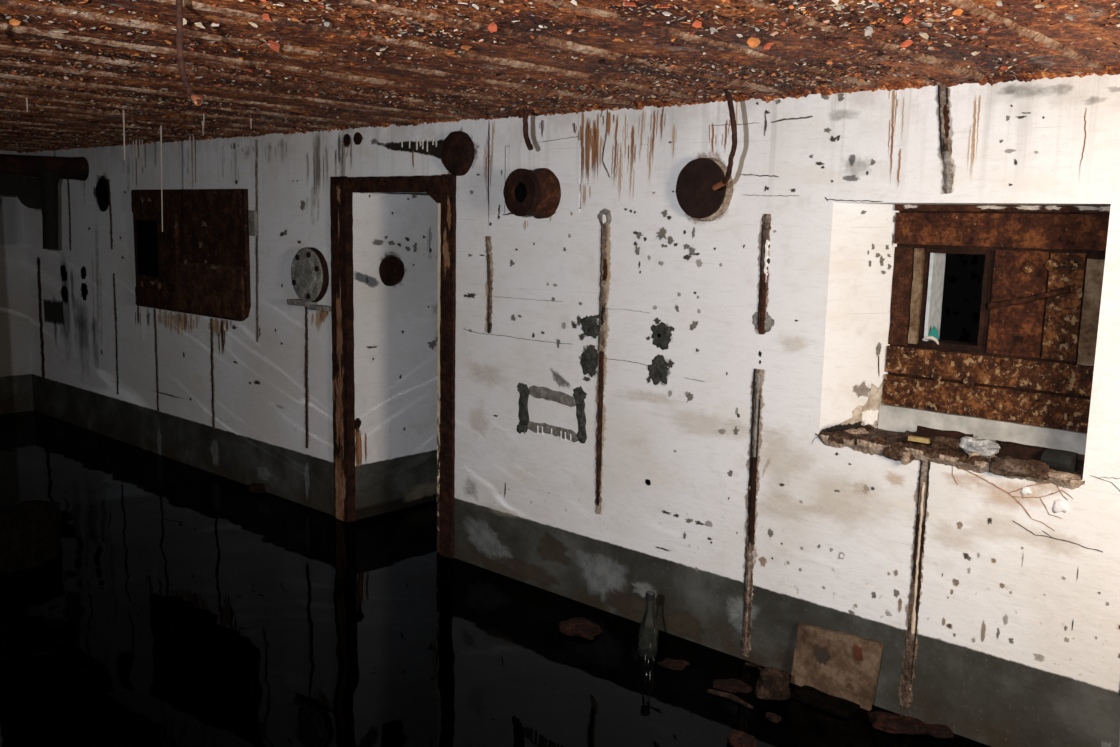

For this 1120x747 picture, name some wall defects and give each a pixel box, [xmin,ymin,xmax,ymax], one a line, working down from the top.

rust [572,108,675,201]
rust [698,105,737,161]
rust [888,91,904,183]
spalling [938,85,954,194]
rust [968,97,981,162]
rust [158,310,231,352]
spalling [557,208,636,514]
spalling [718,351,764,657]
crack [952,466,1103,552]
spalling [901,460,931,708]